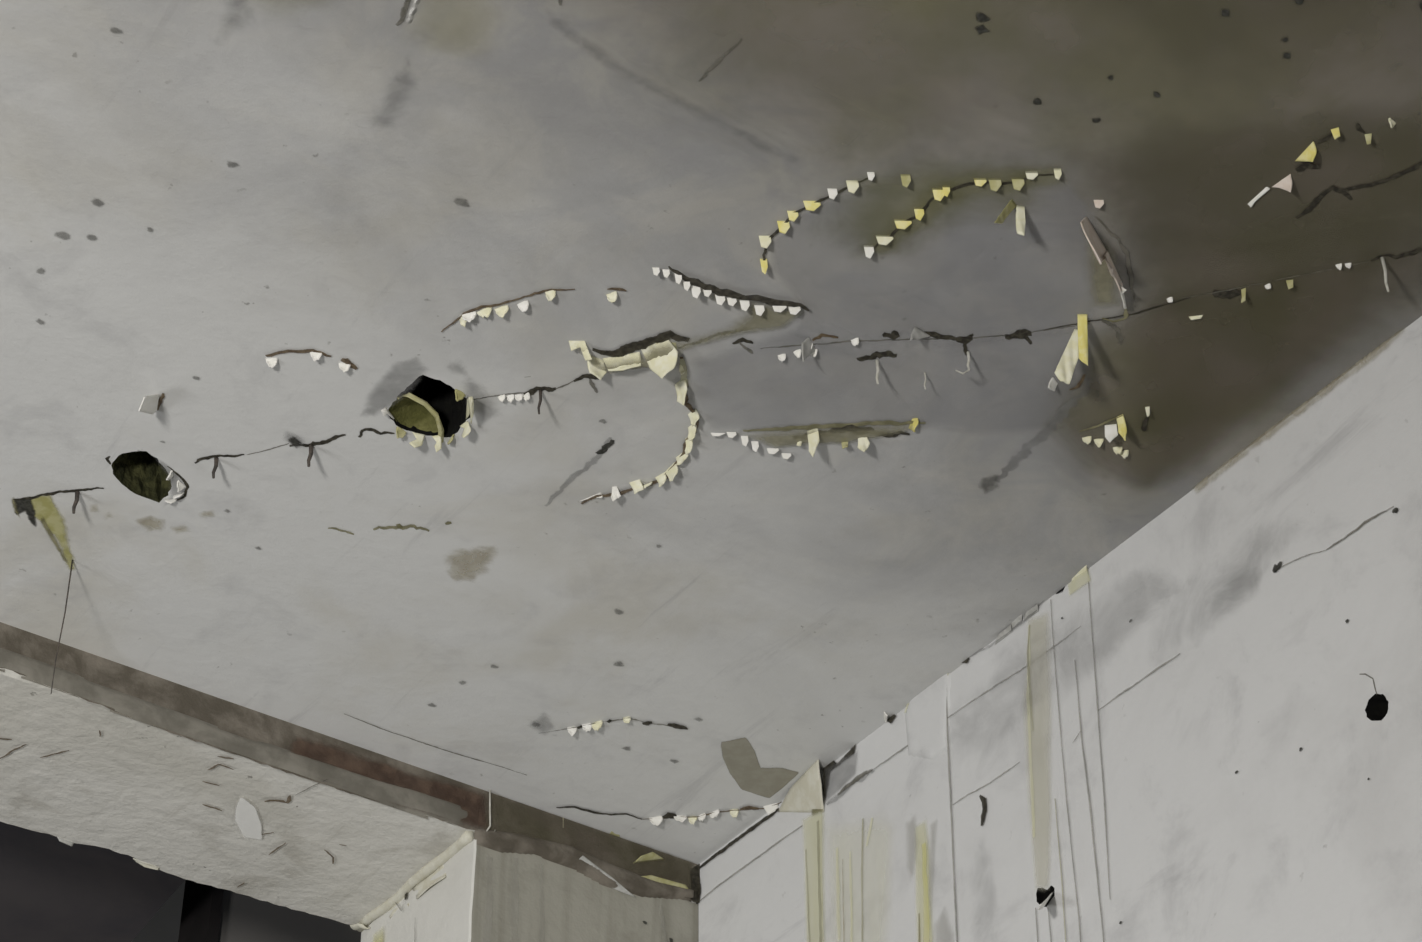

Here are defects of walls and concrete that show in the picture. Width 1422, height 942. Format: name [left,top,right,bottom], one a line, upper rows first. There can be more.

water stain [700,0,1422,473]
crack [678,247,1422,362]
crack [13,487,104,500]
spalling [105,451,189,504]
crack [195,428,395,464]
spalling [381,375,474,452]
crack [473,374,599,403]
peeling [569,266,926,504]
water stain [1035,600,1081,942]
water stain [1074,567,1122,942]
peeling [350,744,856,932]
water stain [805,815,873,942]